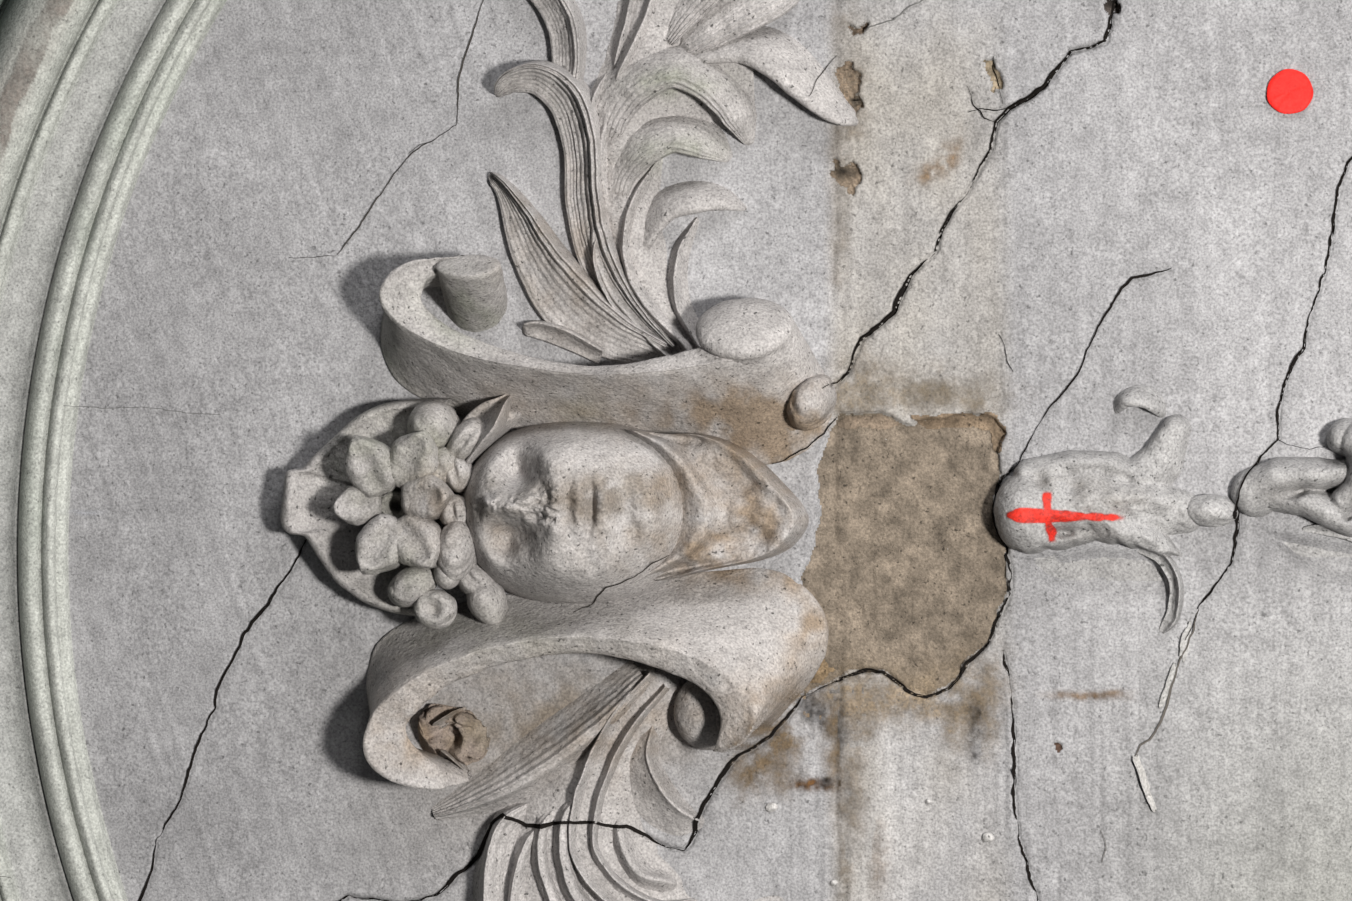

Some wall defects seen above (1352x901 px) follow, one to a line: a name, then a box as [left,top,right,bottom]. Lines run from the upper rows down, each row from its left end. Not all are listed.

crack [289,0,484,258]
flaking render [830,159,862,196]
flaking render [835,61,864,113]
crack [823,0,1117,388]
flaking render [983,60,1003,93]
crack [1185,157,1352,640]
crack [138,539,307,901]
crack [339,268,1171,901]
flaking render [801,412,1008,695]